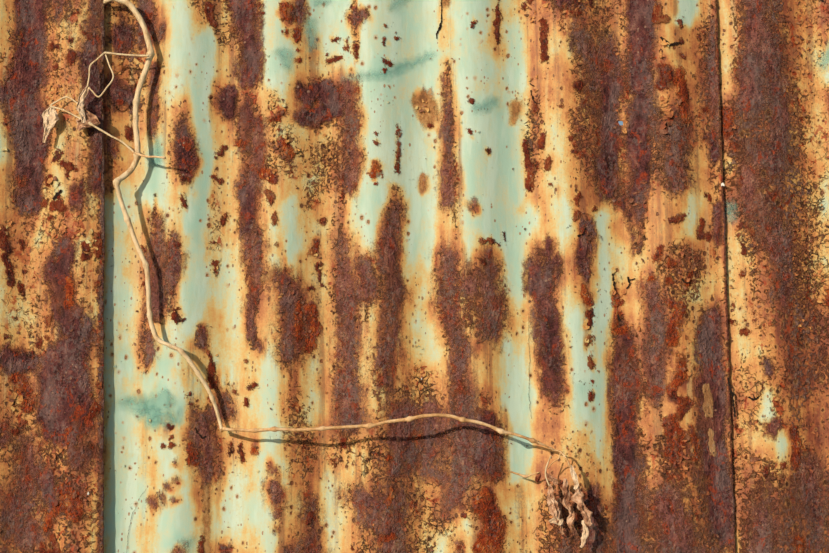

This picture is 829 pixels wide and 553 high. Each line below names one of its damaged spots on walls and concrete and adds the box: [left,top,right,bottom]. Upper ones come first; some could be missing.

corrosion [112,0,166,59]
corrosion [538,17,549,63]
corrosion [0,0,134,221]
corrosion [147,62,160,136]
corrosion [171,115,199,184]
corrosion [522,132,553,193]
corrosion [214,0,509,553]
peeling [778,224,829,303]
corrosion [0,224,102,472]
corrosion [522,236,566,407]
corrosion [160,423,176,450]
corrosion [172,324,261,553]